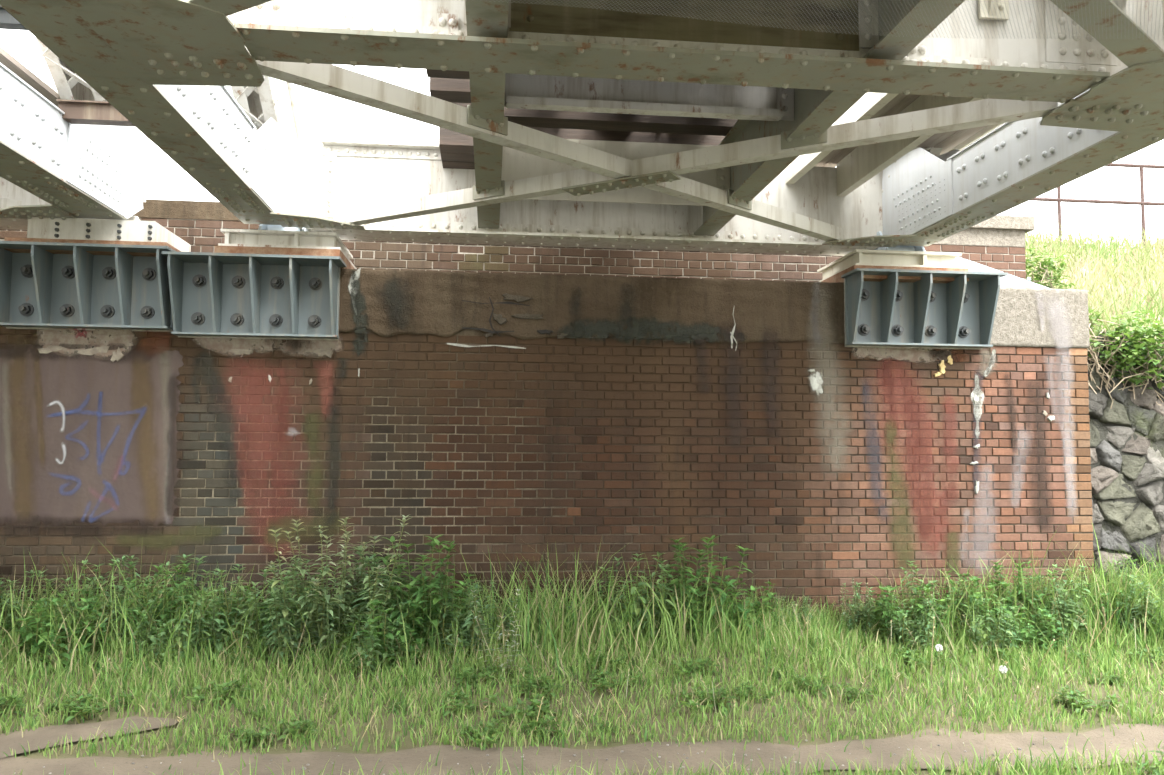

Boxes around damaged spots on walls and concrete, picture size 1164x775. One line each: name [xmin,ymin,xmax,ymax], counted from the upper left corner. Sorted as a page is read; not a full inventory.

damp [0,335,179,536]
peeling [37,328,170,363]
peeling [195,338,341,358]
damp [559,289,746,445]
peeling [853,346,965,377]
efflorescence [970,348,996,494]
damp [1008,380,1017,450]
damp [1030,388,1053,528]